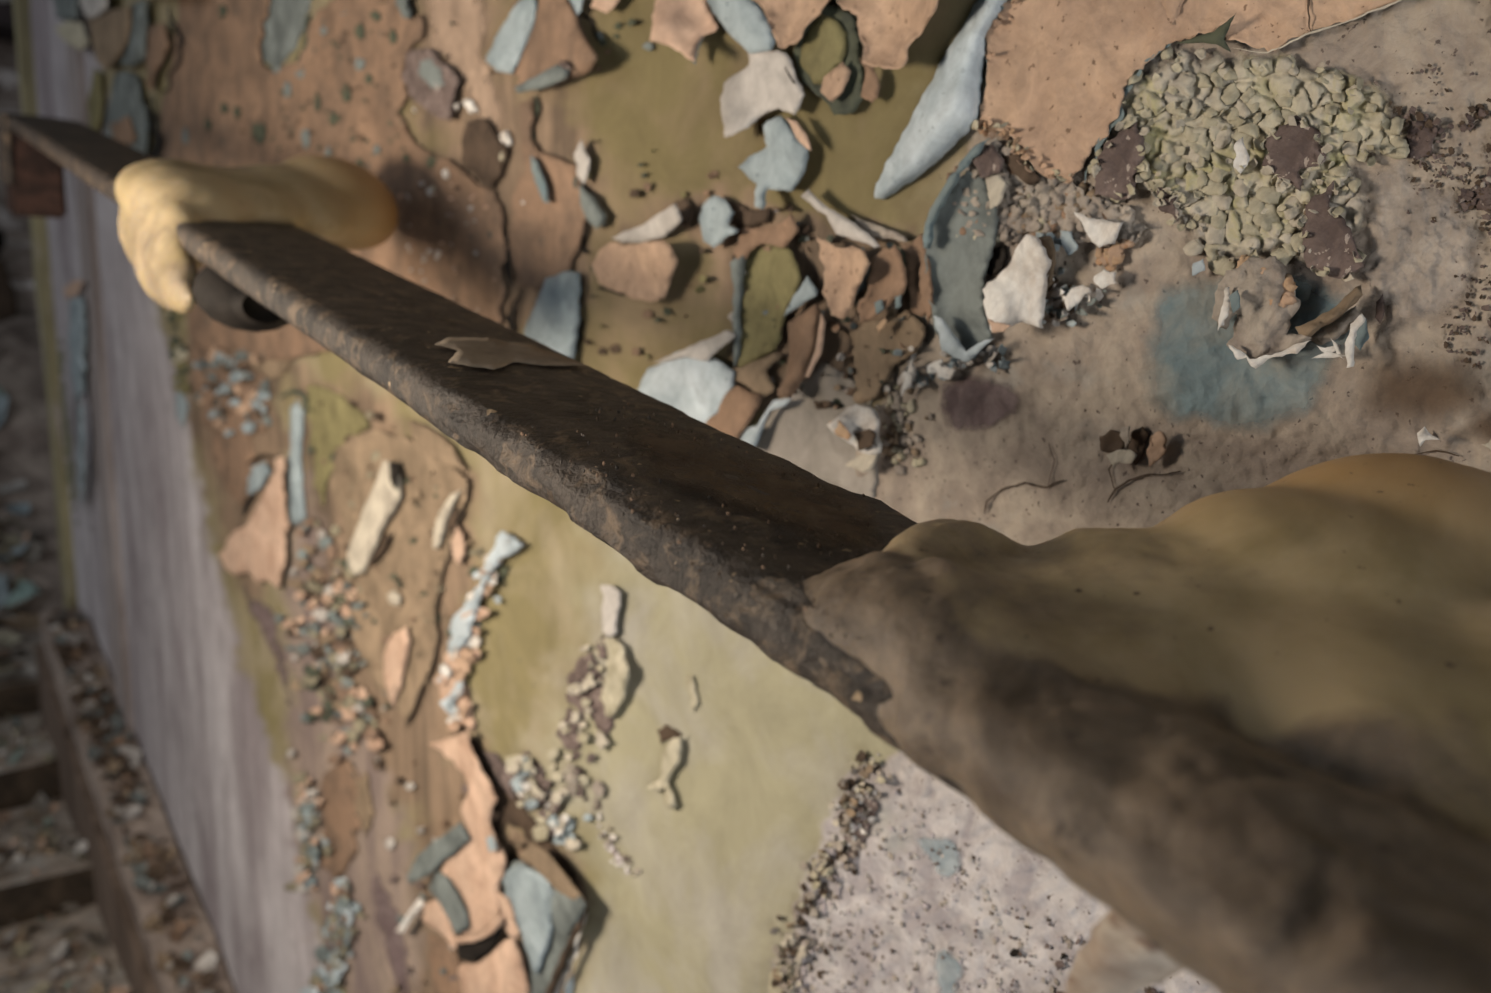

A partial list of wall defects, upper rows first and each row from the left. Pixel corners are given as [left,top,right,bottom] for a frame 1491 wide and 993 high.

peeling [306,385,630,993]
peeling [53,0,1401,506]
peeling [1417,426,1440,447]
spalling [1387,64,1491,368]